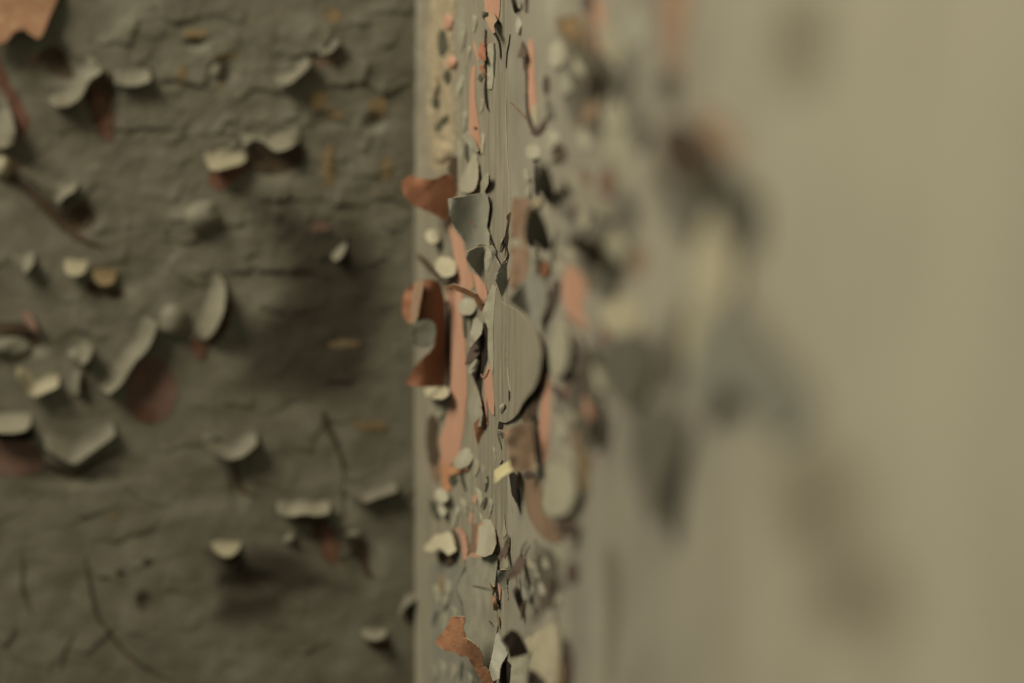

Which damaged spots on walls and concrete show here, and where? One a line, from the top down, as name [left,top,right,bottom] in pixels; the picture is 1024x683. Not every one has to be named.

peeling [0,0,151,142]
peeling [274,37,340,86]
peeling [0,61,29,180]
peeling [204,129,307,191]
peeling [64,259,126,301]
peeling [15,317,177,424]
peeling [190,273,232,362]
peeling [398,0,815,683]
peeling [0,413,122,479]
peeling [202,432,257,497]
peeling [277,500,331,543]
peeling [344,481,397,503]